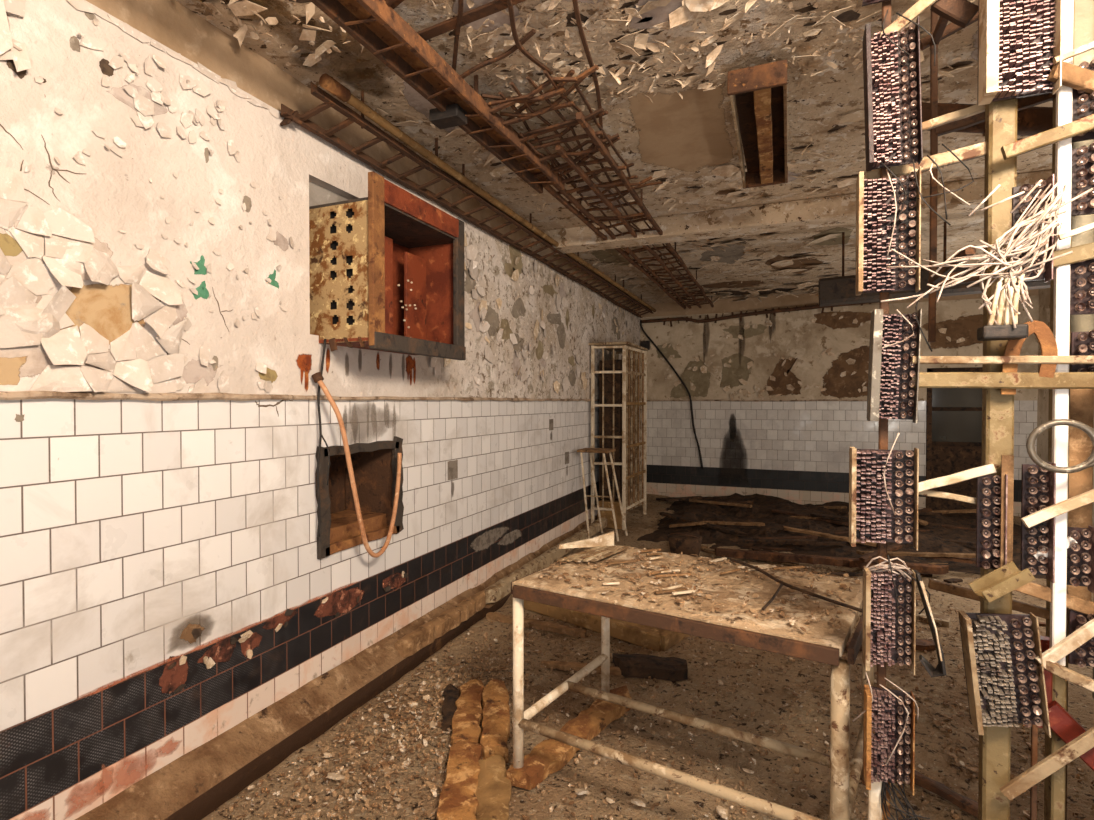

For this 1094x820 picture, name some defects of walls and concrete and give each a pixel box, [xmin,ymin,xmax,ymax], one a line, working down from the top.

peeling [200,0,364,67]
peeling [67,0,336,163]
peeling [425,0,882,216]
crack [0,124,84,204]
peeling [0,164,249,393]
corrosion [296,354,312,391]
corrosion [376,352,416,385]
peeling [650,343,869,400]
water stain [343,405,396,443]
spalling [159,609,298,694]
corrosion [24,811,46,820]
corrosion [67,740,179,817]